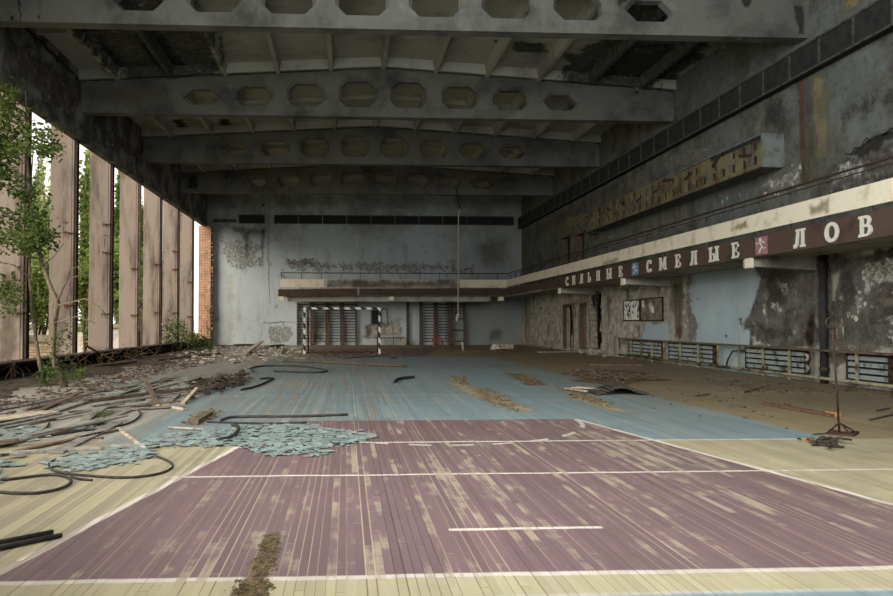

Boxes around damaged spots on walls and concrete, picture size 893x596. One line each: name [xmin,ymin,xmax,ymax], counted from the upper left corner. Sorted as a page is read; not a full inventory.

damp [812,77,893,197]
flaking render [530,293,602,355]
peeling [683,275,701,341]